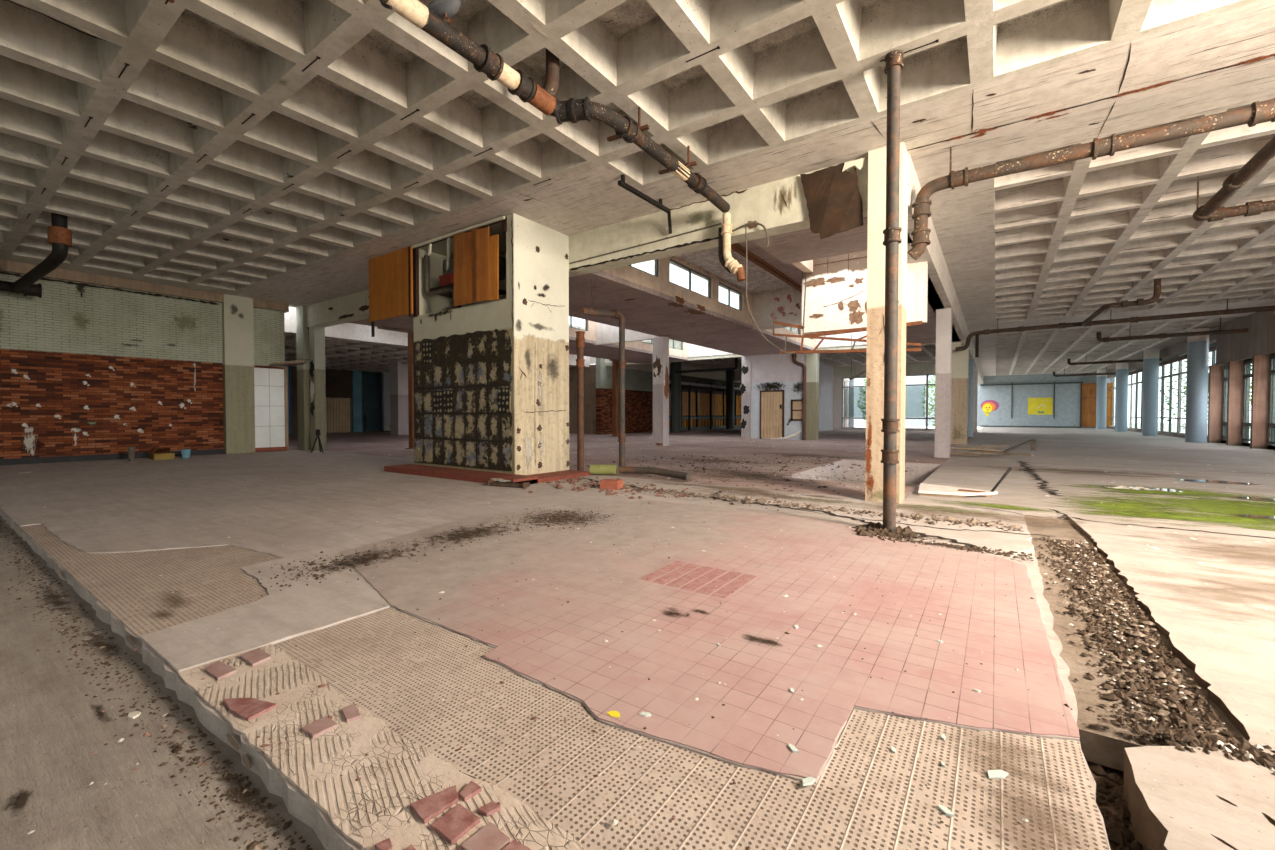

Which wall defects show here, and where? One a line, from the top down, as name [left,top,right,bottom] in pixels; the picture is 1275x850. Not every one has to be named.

peeling [803,277,867,325]